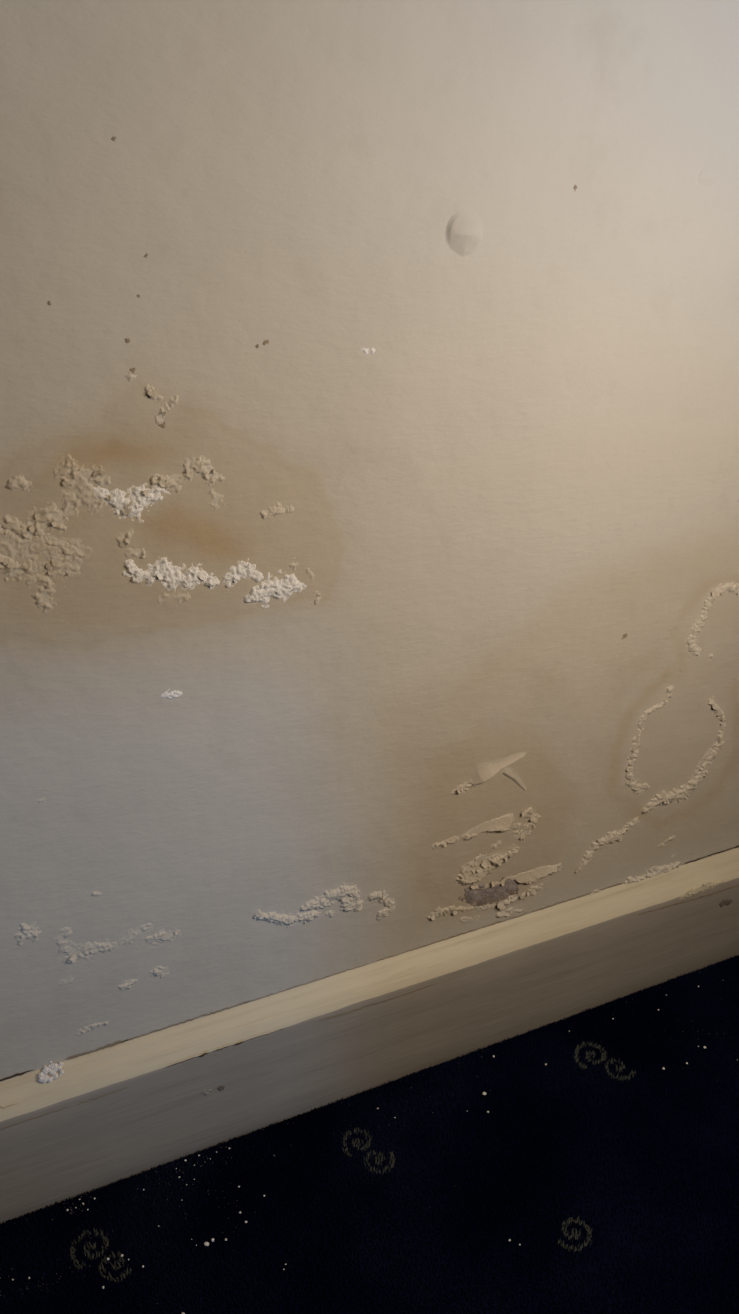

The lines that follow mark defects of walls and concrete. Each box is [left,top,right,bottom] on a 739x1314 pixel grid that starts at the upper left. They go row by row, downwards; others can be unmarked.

peeling [0,454,322,615]
peeling [686,581,739,661]
peeling [427,685,726,924]
peeling [252,882,398,928]